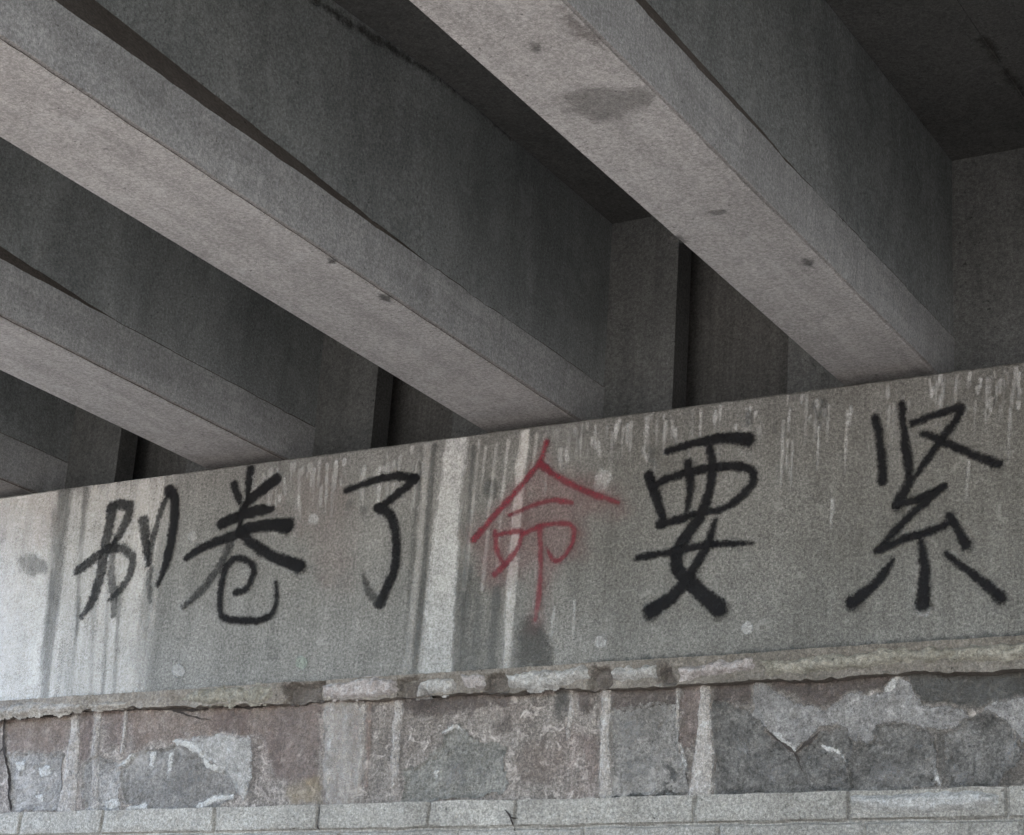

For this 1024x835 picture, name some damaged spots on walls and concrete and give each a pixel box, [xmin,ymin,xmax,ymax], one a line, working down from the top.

leakage [0,477,164,701]
leakage [421,437,468,674]
leakage [493,430,529,628]
spalling [79,733,252,811]
spalling [710,676,1024,794]